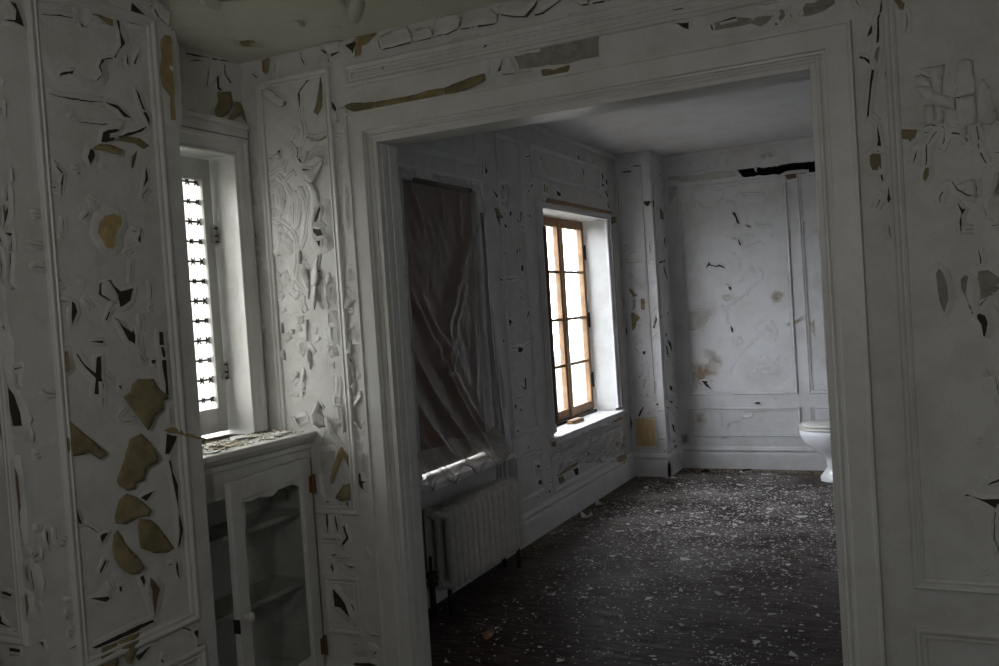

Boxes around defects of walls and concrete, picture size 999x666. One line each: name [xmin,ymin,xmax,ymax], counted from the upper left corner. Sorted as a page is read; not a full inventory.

peeling [127,0,150,16]
peeling [431,0,629,38]
peeling [670,19,693,32]
spalling [733,159,815,183]
peeling [705,260,726,270]
peeling [929,248,999,339]
peeling [688,303,719,334]
peeling [46,26,608,666]
peeling [555,196,679,486]
peeling [964,473,999,559]
peeling [0,545,45,632]